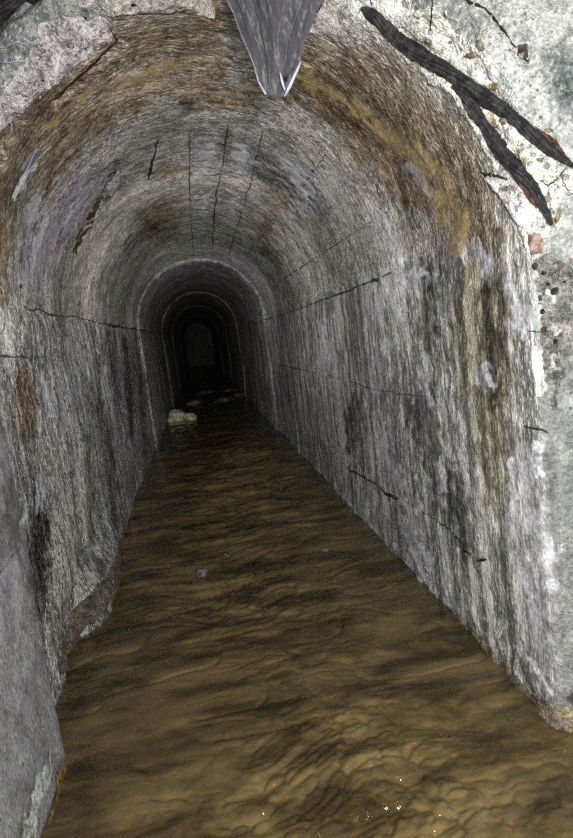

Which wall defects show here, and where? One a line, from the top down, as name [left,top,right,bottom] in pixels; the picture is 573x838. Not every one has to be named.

spalling [0,0,216,132]
crack [464,0,529,62]
water stain [12,163,38,199]
water stain [29,179,96,285]
peeling [72,159,122,256]
water stain [142,253,289,321]
water stain [193,141,317,226]
water stain [362,210,437,323]
spalling [309,0,573,410]
water stain [478,237,492,277]
water stain [23,748,68,838]